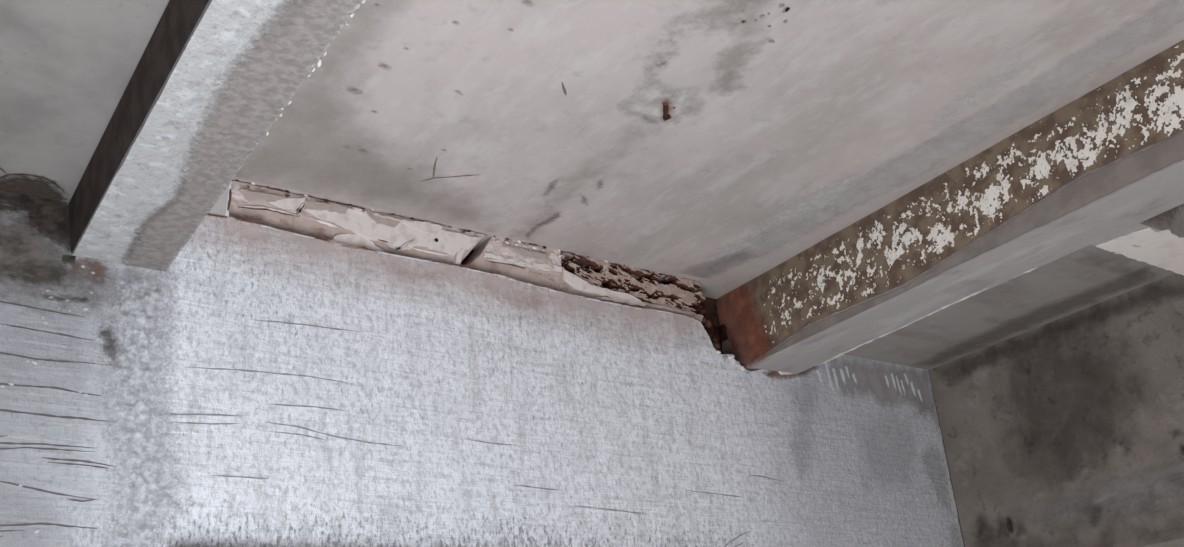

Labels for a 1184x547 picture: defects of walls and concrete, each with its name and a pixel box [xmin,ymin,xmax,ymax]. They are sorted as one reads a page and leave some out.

spalling [256,0,365,145]
damp [741,0,790,43]
damp [0,0,209,301]
peeling [227,40,1184,374]
rust [716,284,770,366]
spalling [766,366,816,378]
damp [817,272,1141,547]